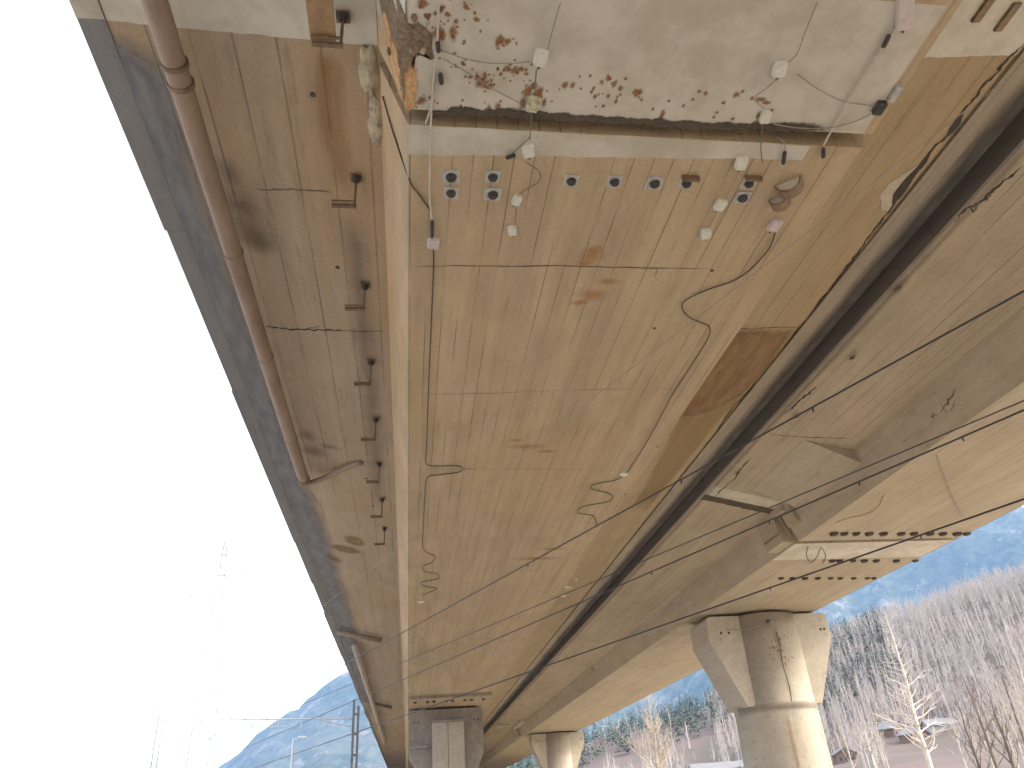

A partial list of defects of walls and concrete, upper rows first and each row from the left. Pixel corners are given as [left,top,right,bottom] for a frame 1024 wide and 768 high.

spalling [379,0,434,114]
rust [419,0,670,118]
crack [253,184,331,193]
crack [740,44,1024,347]
spalling [880,165,919,212]
crack [267,325,375,333]
crack [717,381,757,431]
crack [930,389,956,419]
crack [776,631,792,701]